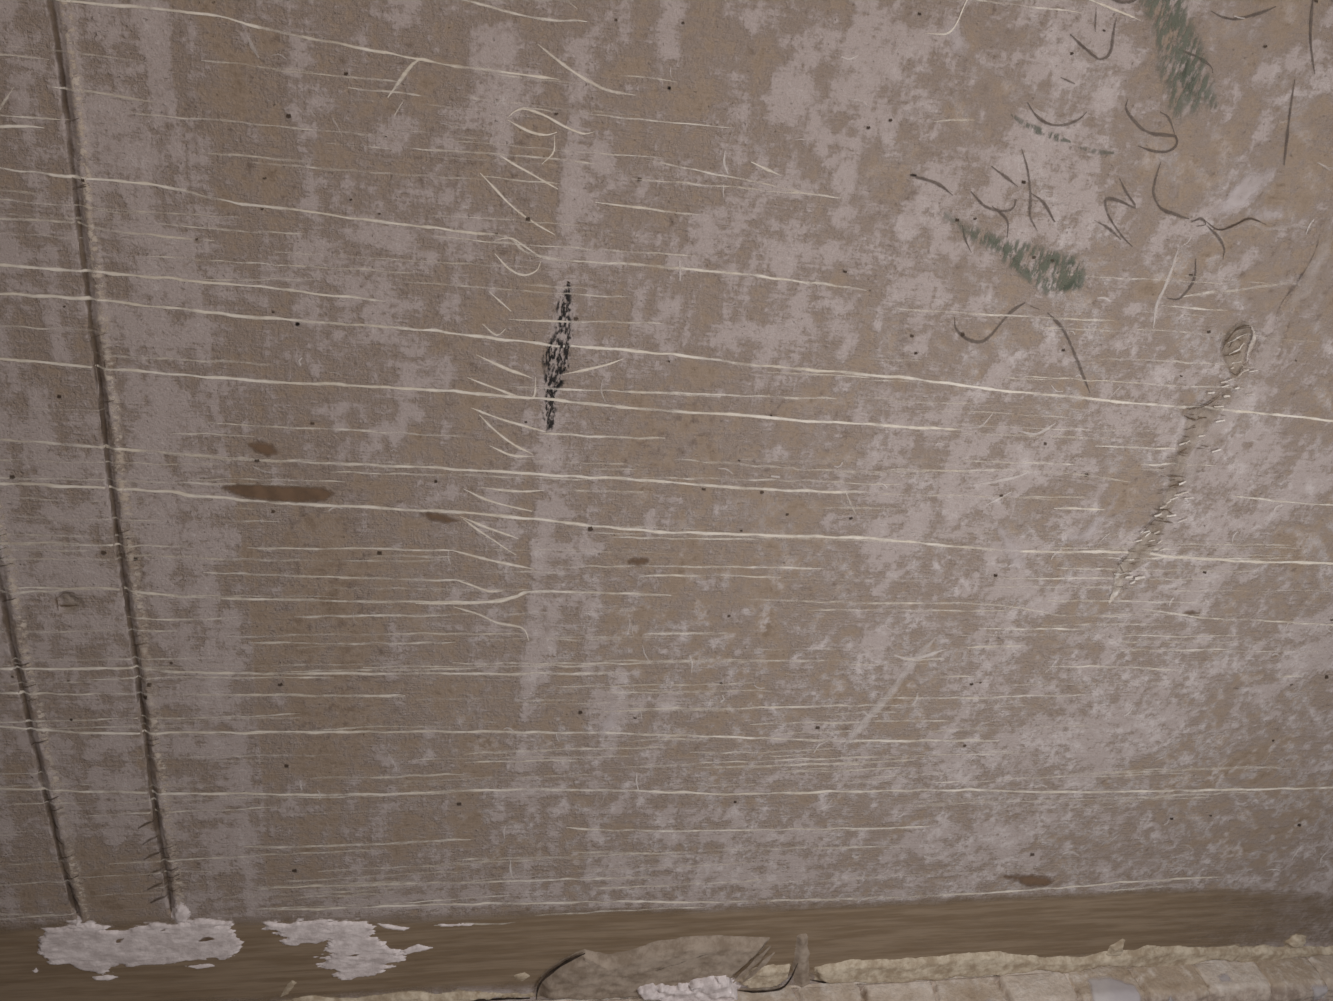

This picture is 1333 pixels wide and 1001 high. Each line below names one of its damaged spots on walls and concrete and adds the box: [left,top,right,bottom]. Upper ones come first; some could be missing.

spalling [59,0,150,674]
peeling [0,504,244,980]
peeling [261,918,433,980]
flaking render [277,972,535,1001]
crack [474,953,585,1001]
crack [738,963,827,993]
flaking render [813,933,1333,984]